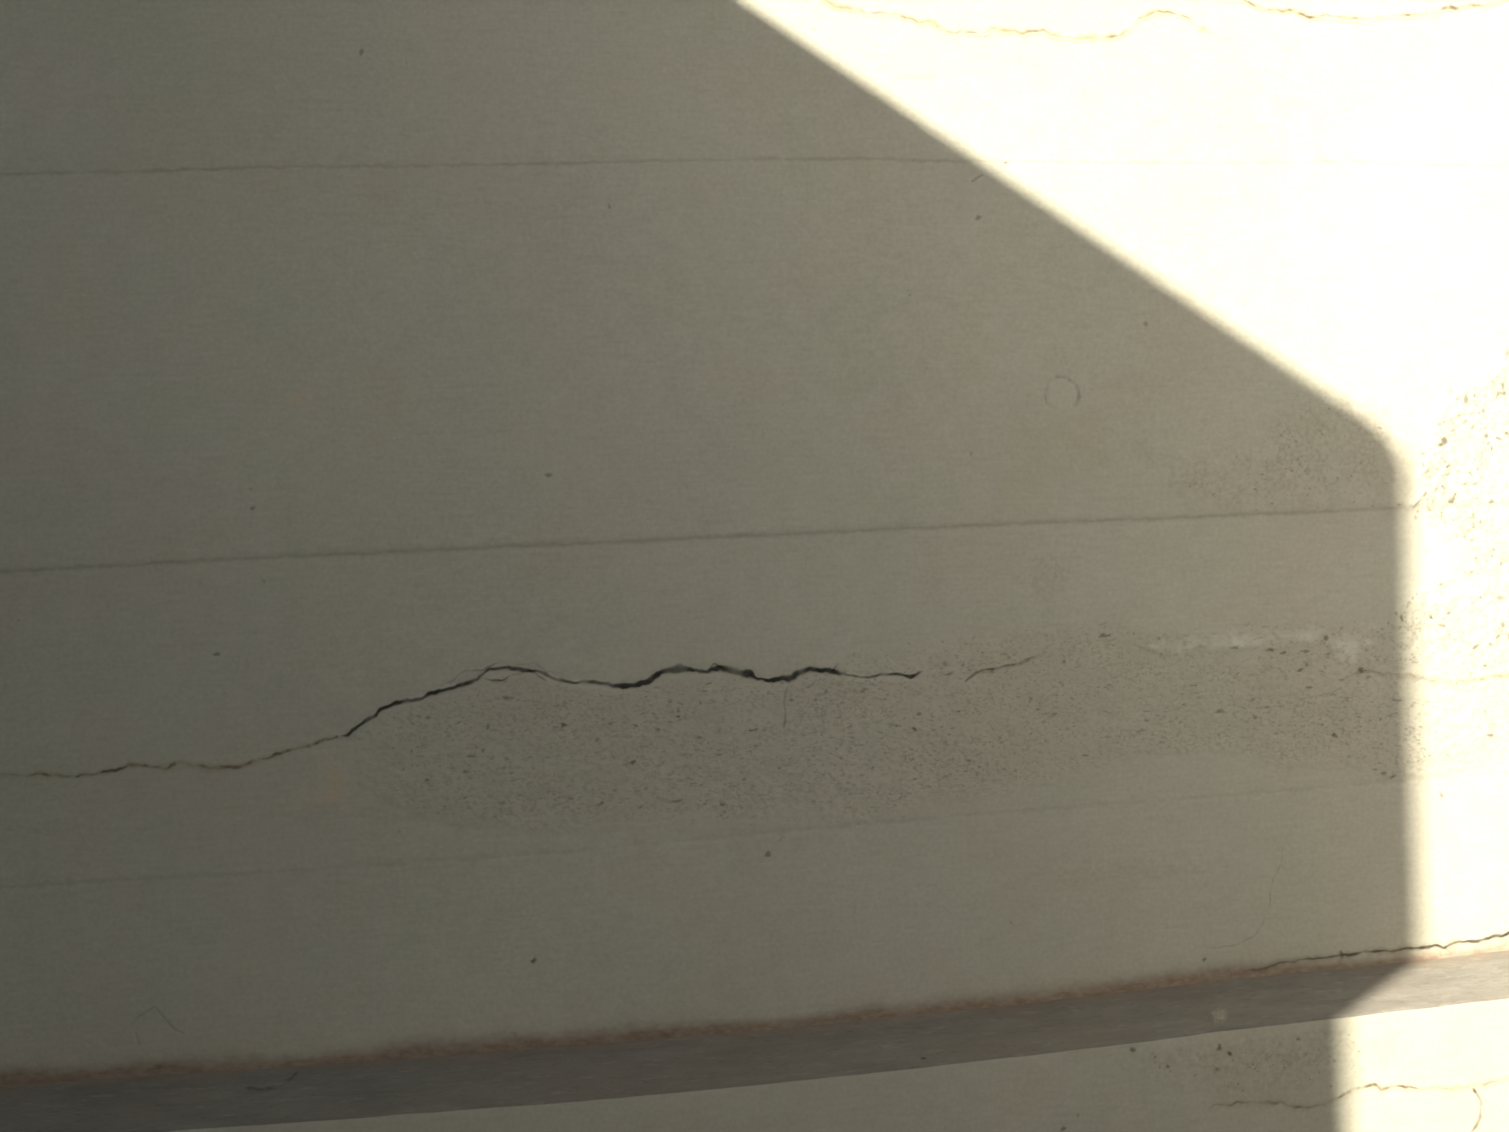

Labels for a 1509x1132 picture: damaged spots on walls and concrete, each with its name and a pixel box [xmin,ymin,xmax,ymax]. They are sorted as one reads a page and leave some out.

crack [820,0,1508,43]
flaking render [347,350,1509,856]
crack [0,663,920,783]
crack [1344,932,1509,956]
crack [1208,1074,1509,1128]